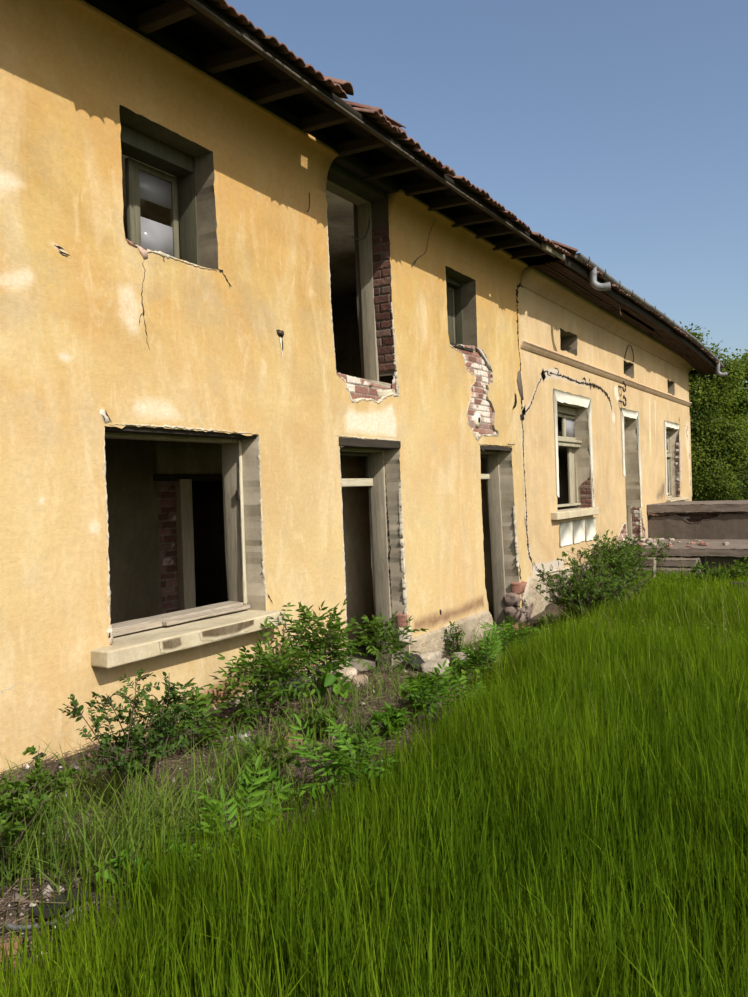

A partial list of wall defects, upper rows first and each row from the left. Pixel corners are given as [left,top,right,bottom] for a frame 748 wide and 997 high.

crack [139,259,165,355]
flaking render [326,205,400,627]
flaking render [450,344,515,447]
crack [512,283,616,572]